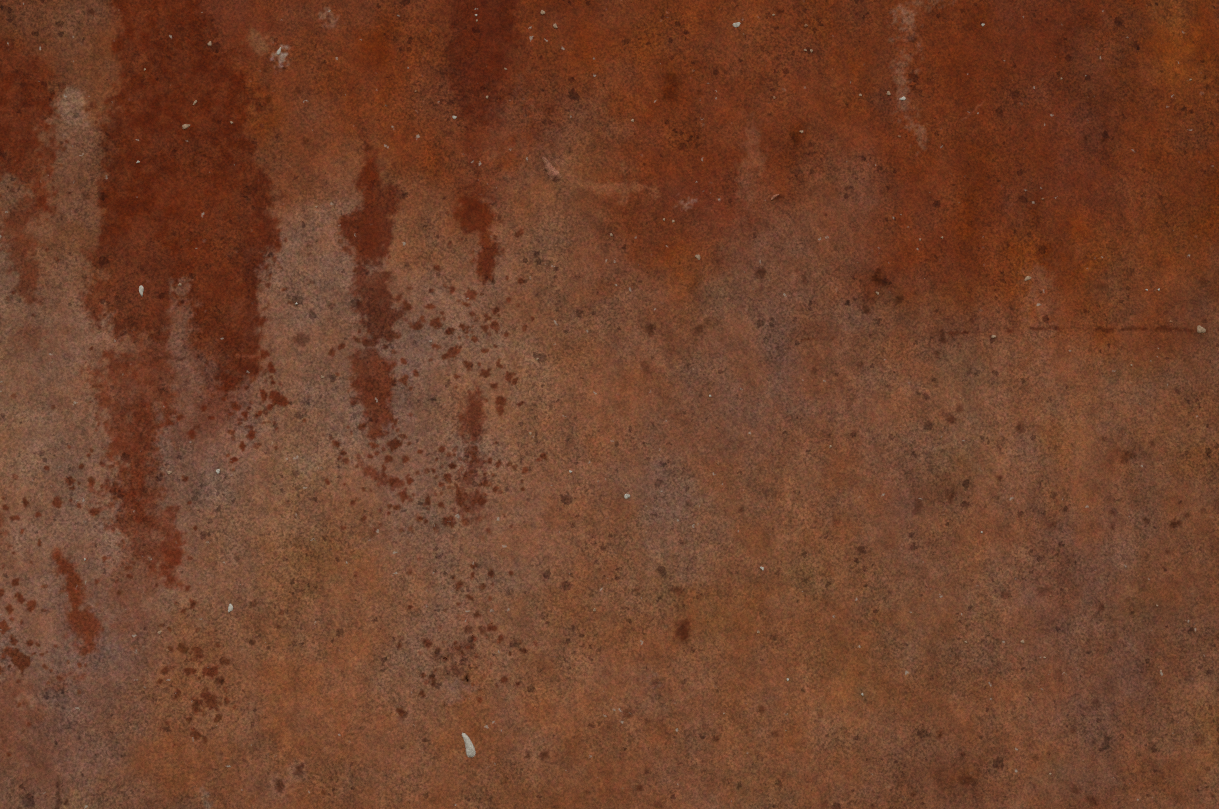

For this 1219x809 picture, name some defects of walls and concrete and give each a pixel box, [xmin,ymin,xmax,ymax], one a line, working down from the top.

corrosion [0,0,296,768]
corrosion [323,0,549,531]